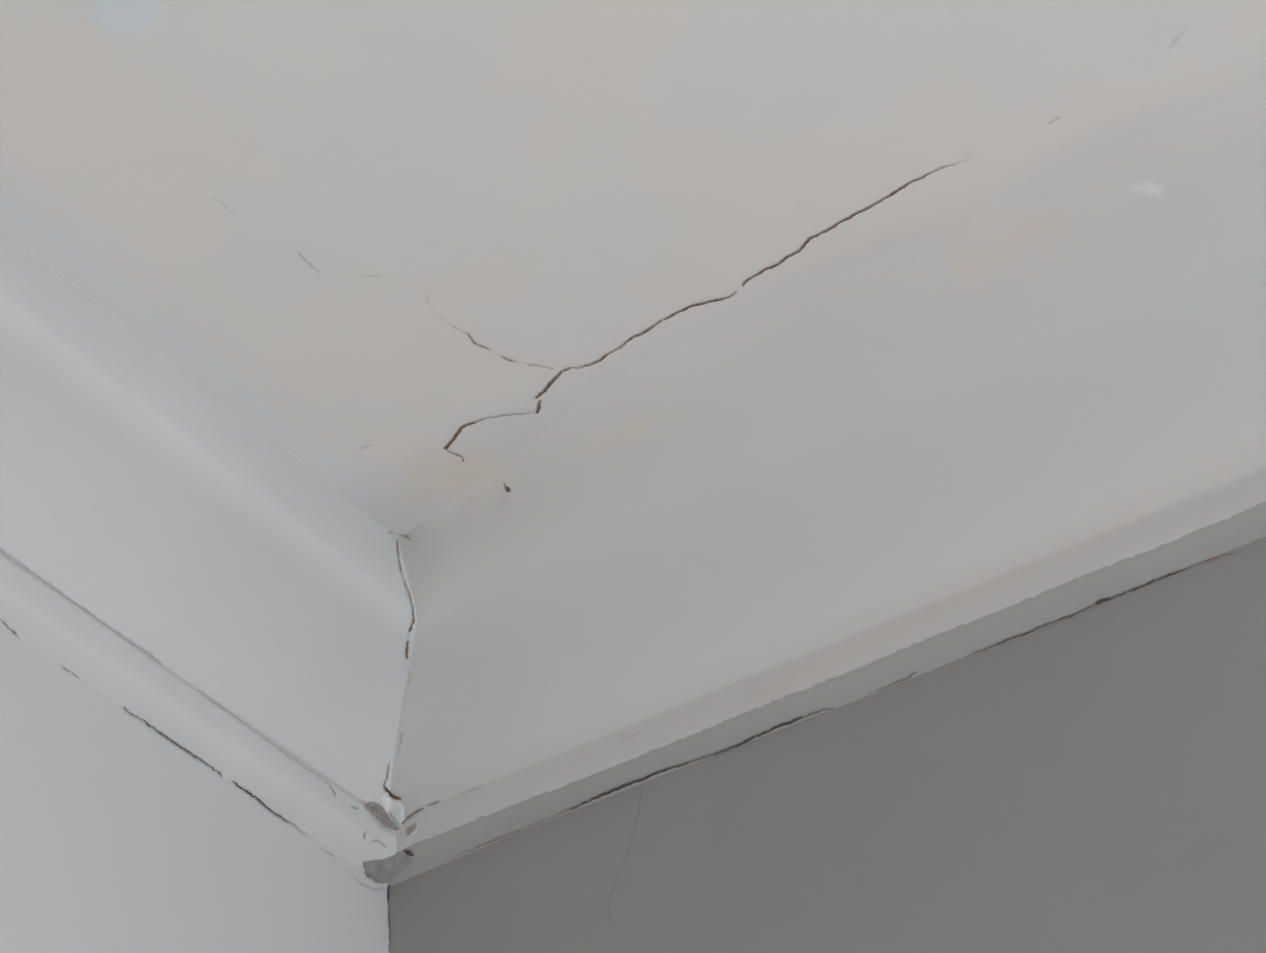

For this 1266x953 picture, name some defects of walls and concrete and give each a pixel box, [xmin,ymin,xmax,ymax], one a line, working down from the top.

crack [444,168,942,462]
crack [397,541,415,659]
crack [996,557,1218,645]
crack [124,707,288,822]
spalling [362,793,420,884]
crack [384,765,437,824]
crack [569,709,831,811]